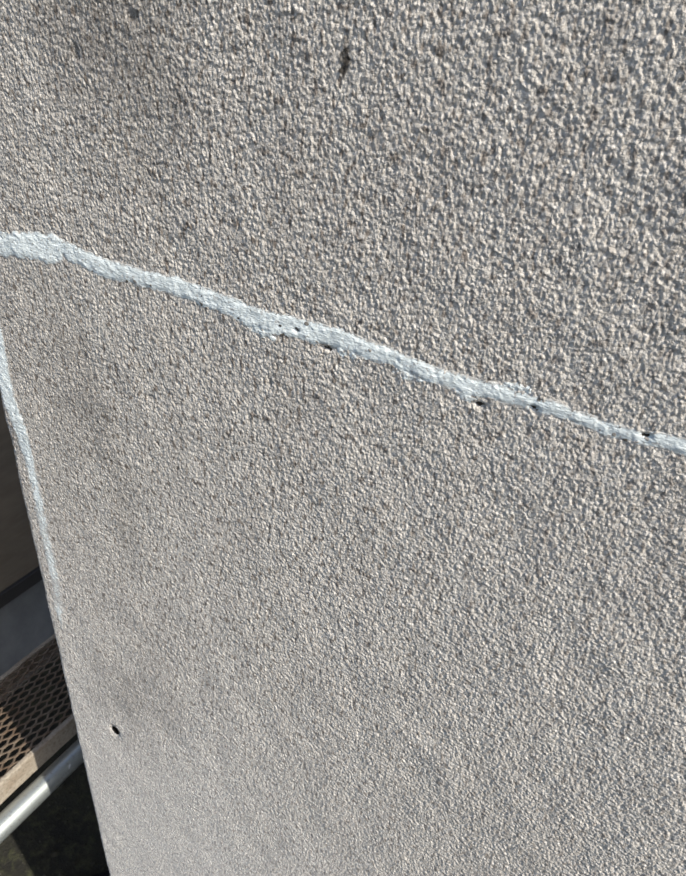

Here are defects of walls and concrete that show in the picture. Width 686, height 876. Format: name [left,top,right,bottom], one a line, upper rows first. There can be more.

crack [0,325,64,630]
crack [0,231,686,457]